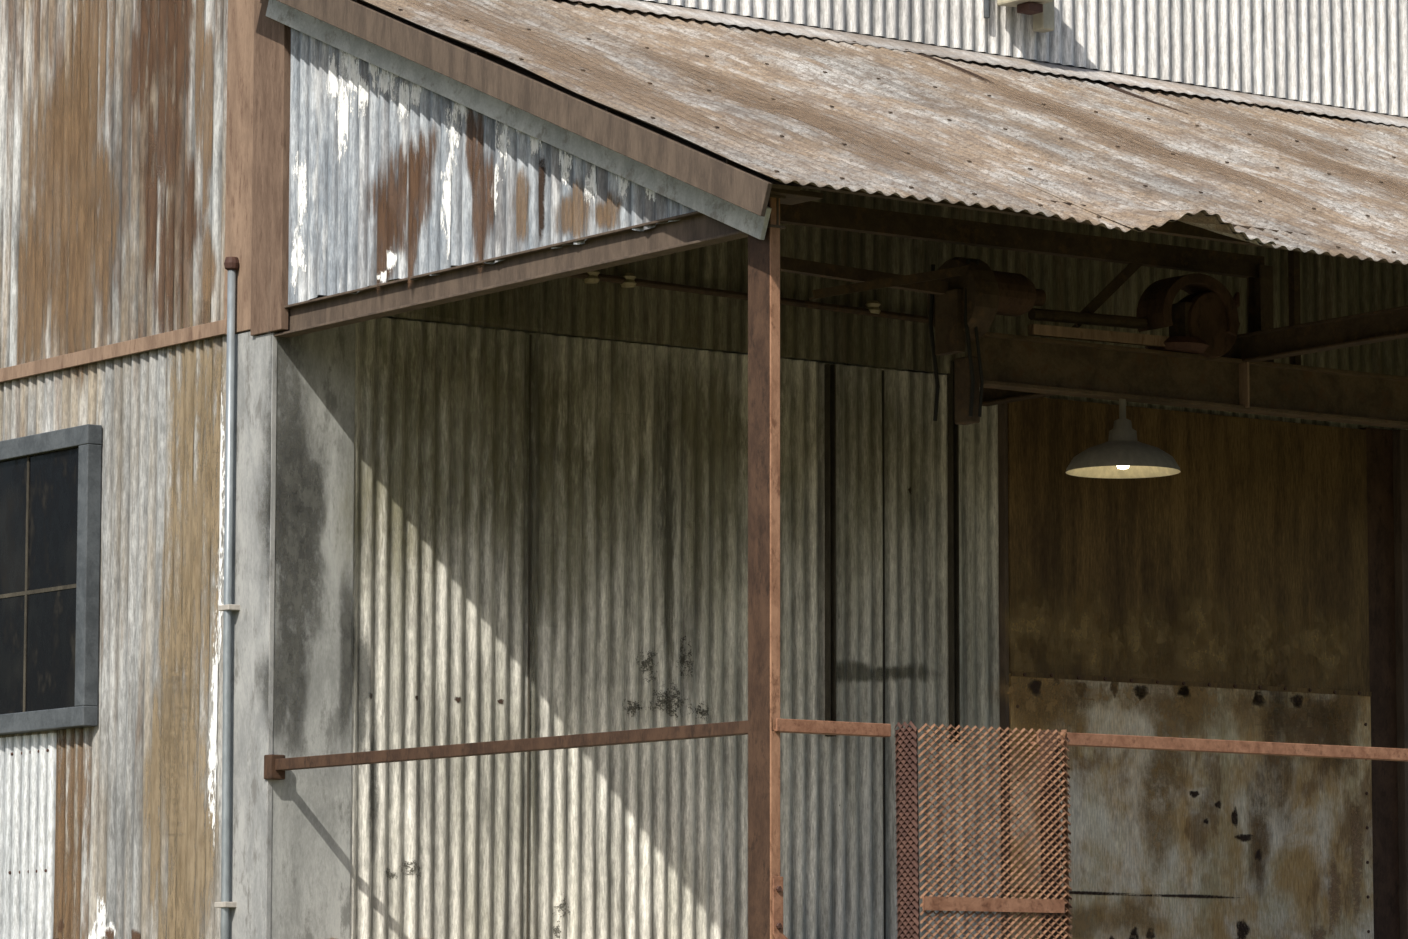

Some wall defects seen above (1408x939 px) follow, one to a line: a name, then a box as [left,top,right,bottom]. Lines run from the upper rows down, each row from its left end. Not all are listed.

peeling [326,51,422,163]
rust [17,0,119,379]
peeling [291,141,308,294]
peeling [377,247,397,283]
rust [368,131,435,287]
rust [466,110,494,269]
rust [516,172,528,237]
rust [557,182,620,238]
rust [131,0,225,939]
leakage [257,332,323,747]
rust [53,728,92,939]
rust [1204,665,1355,889]